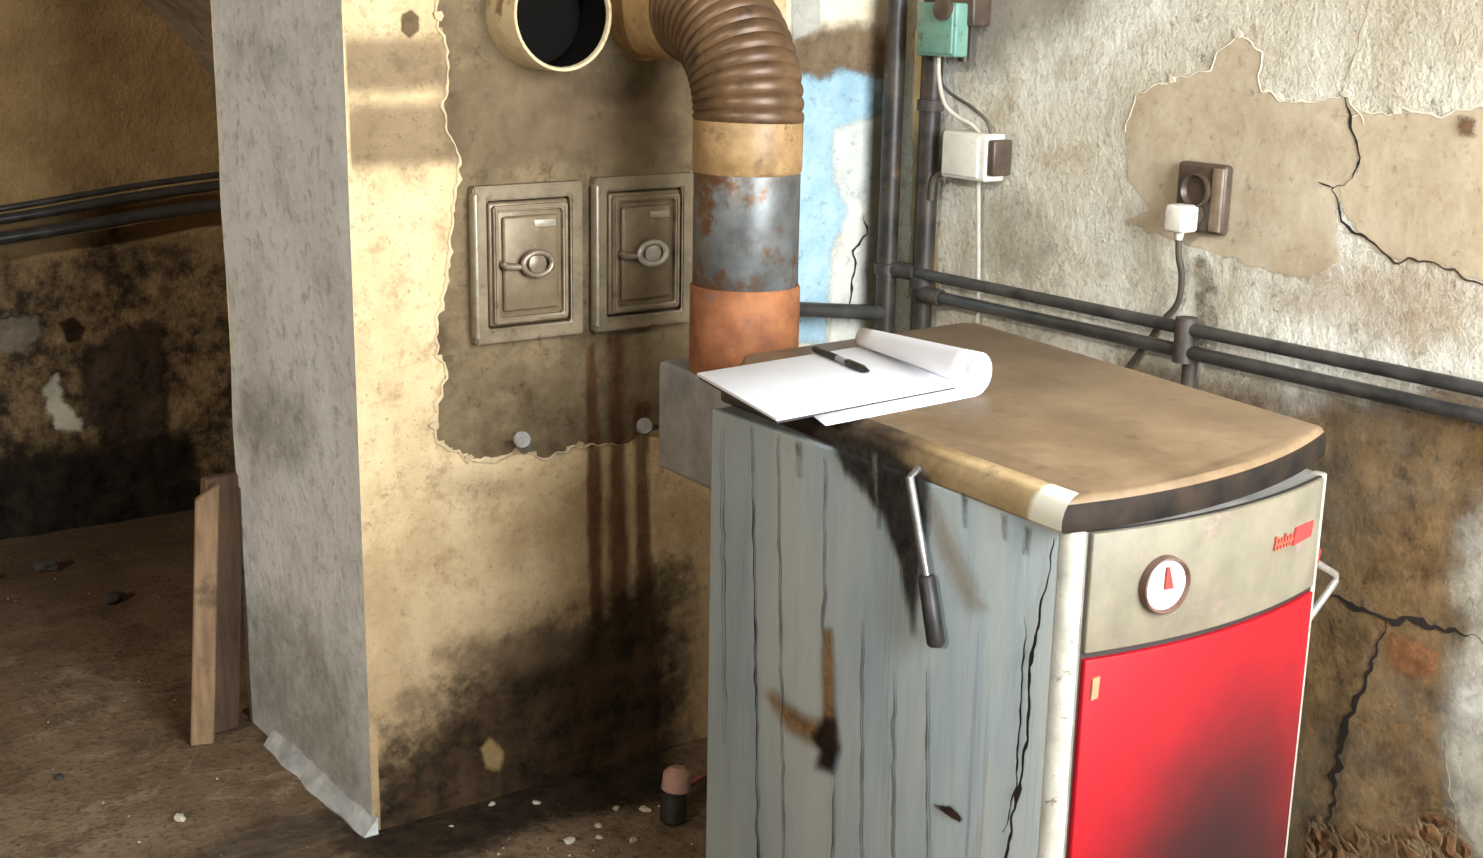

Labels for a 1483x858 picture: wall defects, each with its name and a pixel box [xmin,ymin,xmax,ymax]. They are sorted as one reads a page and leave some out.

spalling [0,317,41,354]
water stain [0,435,199,540]
spalling [43,318,168,447]
water stain [340,564,690,858]
spalling [402,0,694,464]
rust [587,335,650,622]
peeling [798,70,883,344]
peeling [1125,30,1483,280]
water stain [1136,366,1483,858]
spalling [1307,729,1483,858]
crack [1319,0,1483,285]
crack [1325,595,1483,853]